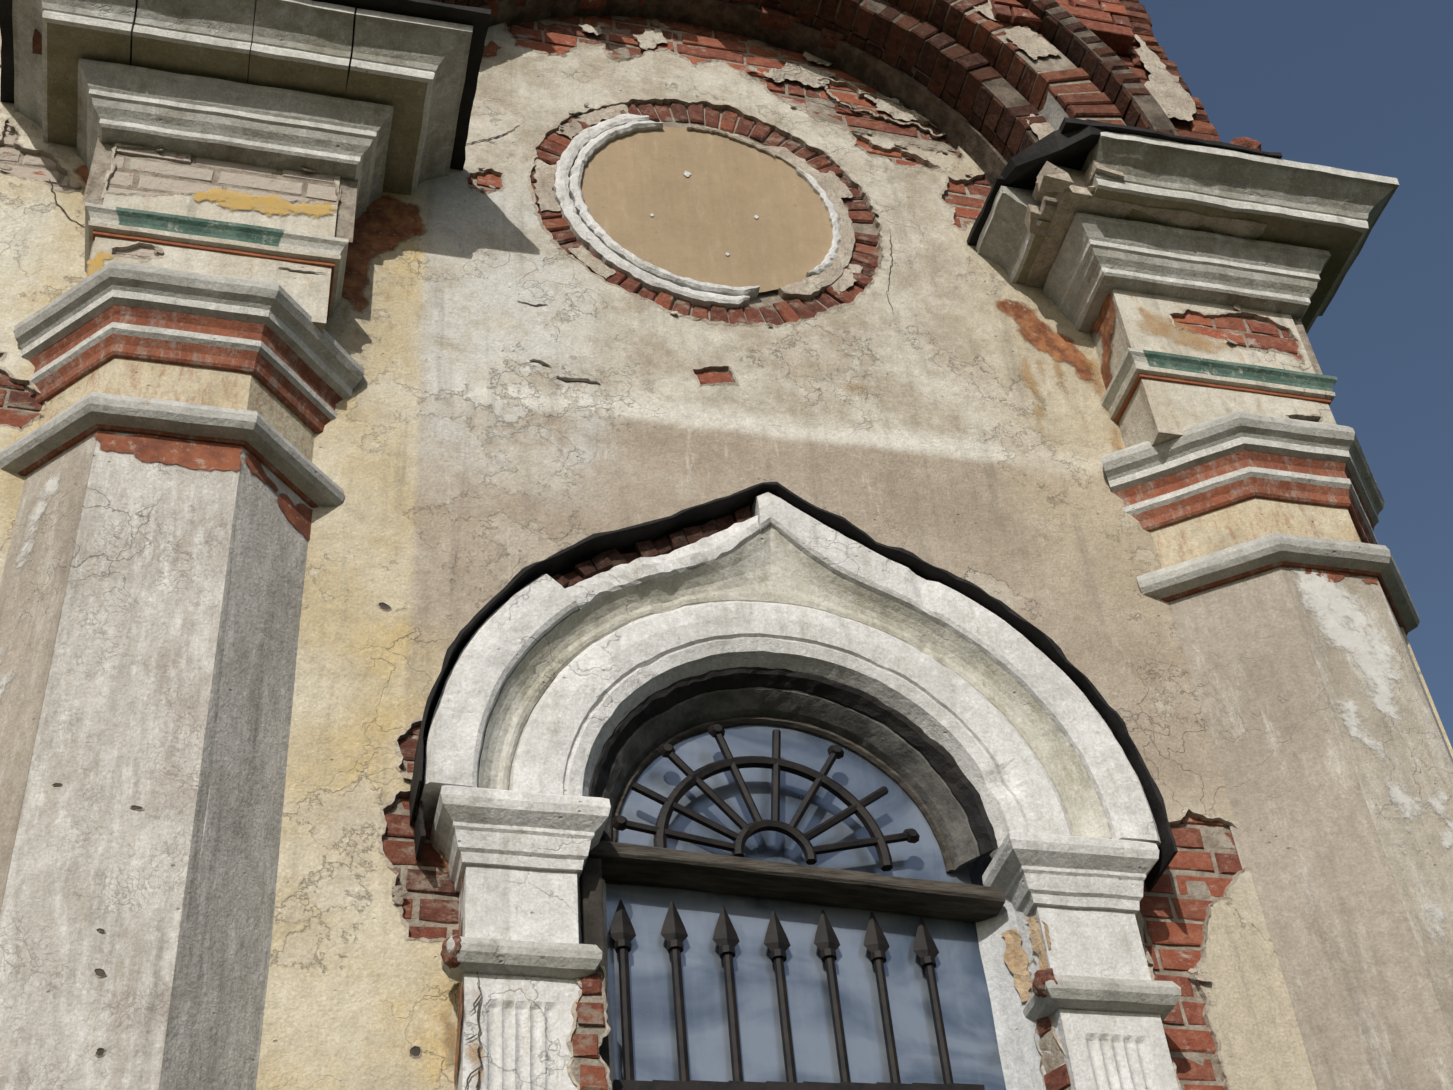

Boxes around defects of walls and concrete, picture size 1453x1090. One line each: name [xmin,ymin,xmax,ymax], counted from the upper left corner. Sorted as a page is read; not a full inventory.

crack [49,180,85,228]
flaking render [86,240,164,271]
flaking render [0,118,358,242]
flaking render [465,166,506,194]
flaking render [527,98,884,328]
flaking render [503,16,991,231]
flaking render [0,351,48,432]
flaking render [377,717,459,943]
flaking render [1001,915,1051,1002]
flaking render [1138,807,1250,1090]
crack [465,972,483,1090]
flaking render [1034,1015,1071,1090]